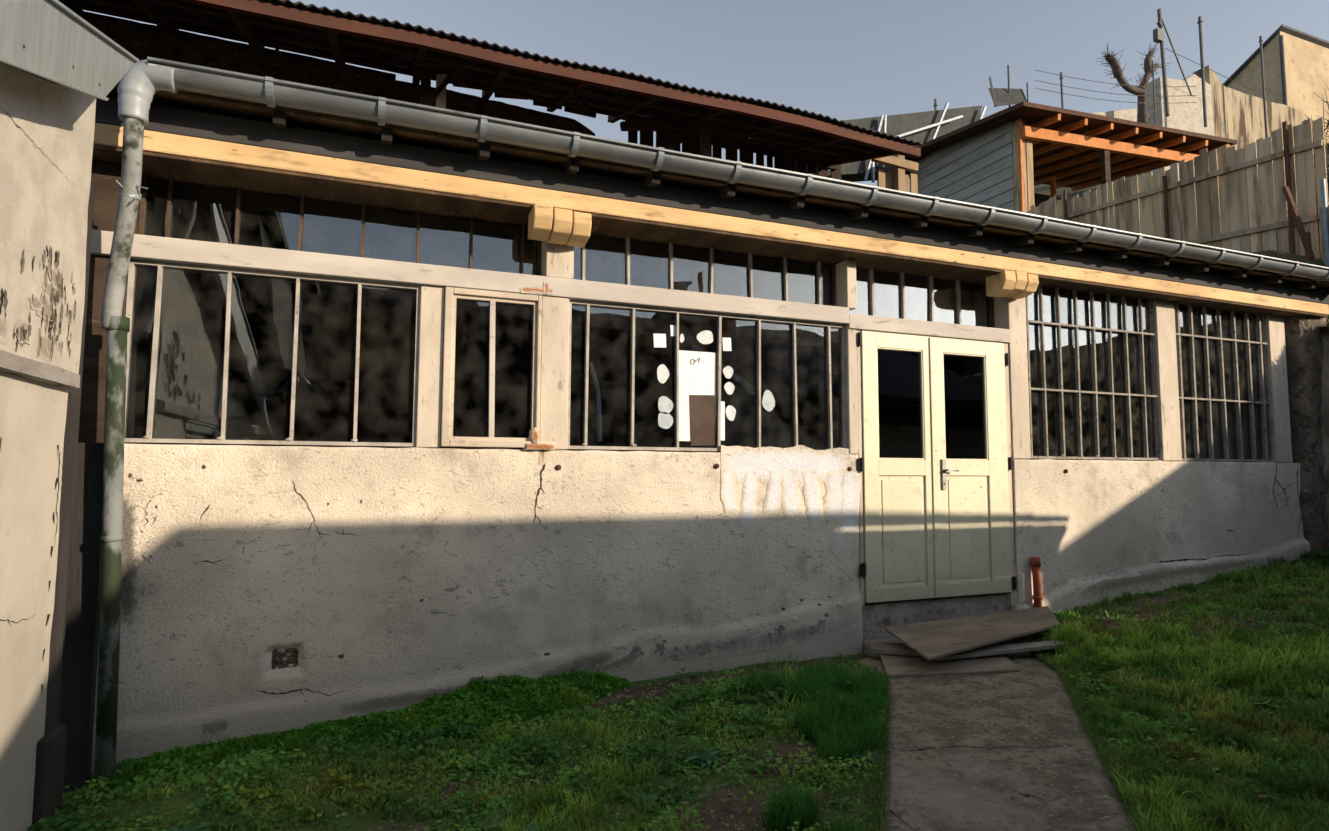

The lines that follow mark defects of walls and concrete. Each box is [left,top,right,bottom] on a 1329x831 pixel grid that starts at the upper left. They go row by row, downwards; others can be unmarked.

peeling [0,246,76,363]
crack [293,483,358,547]
crack [532,453,546,529]
crack [256,688,346,698]
water stain [329,602,981,721]